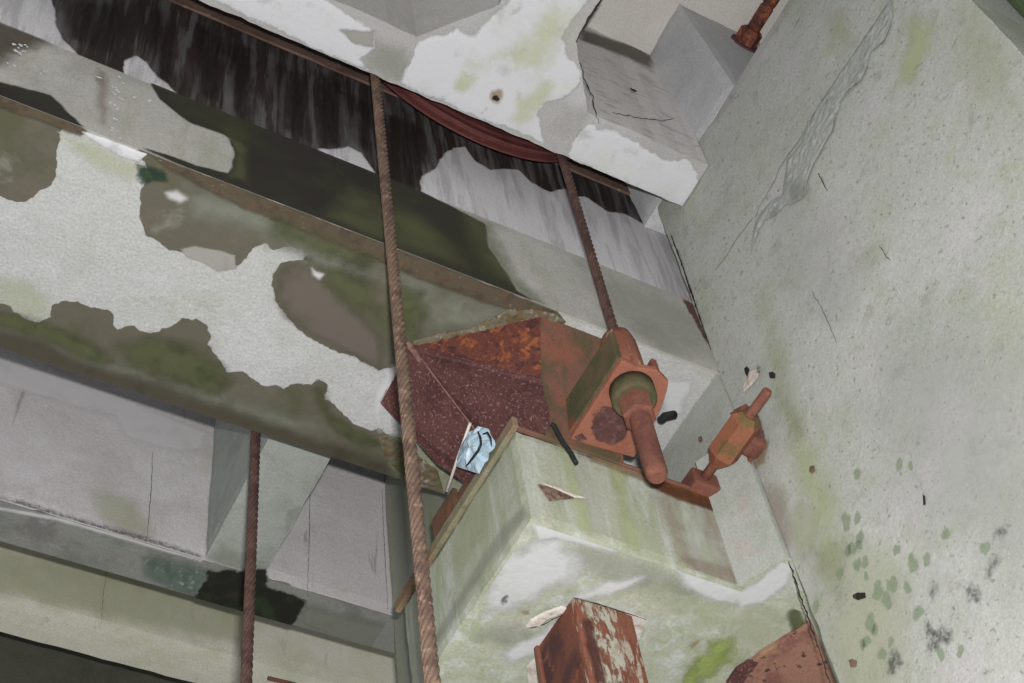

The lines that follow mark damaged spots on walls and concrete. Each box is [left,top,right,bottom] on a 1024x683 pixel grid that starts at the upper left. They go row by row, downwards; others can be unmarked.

peeling [215,0,376,71]
peeling [401,0,587,144]
peeling [82,131,147,161]
peeling [568,124,699,206]
damp [0,0,651,478]
peeling [0,350,205,450]
damp [0,502,304,625]